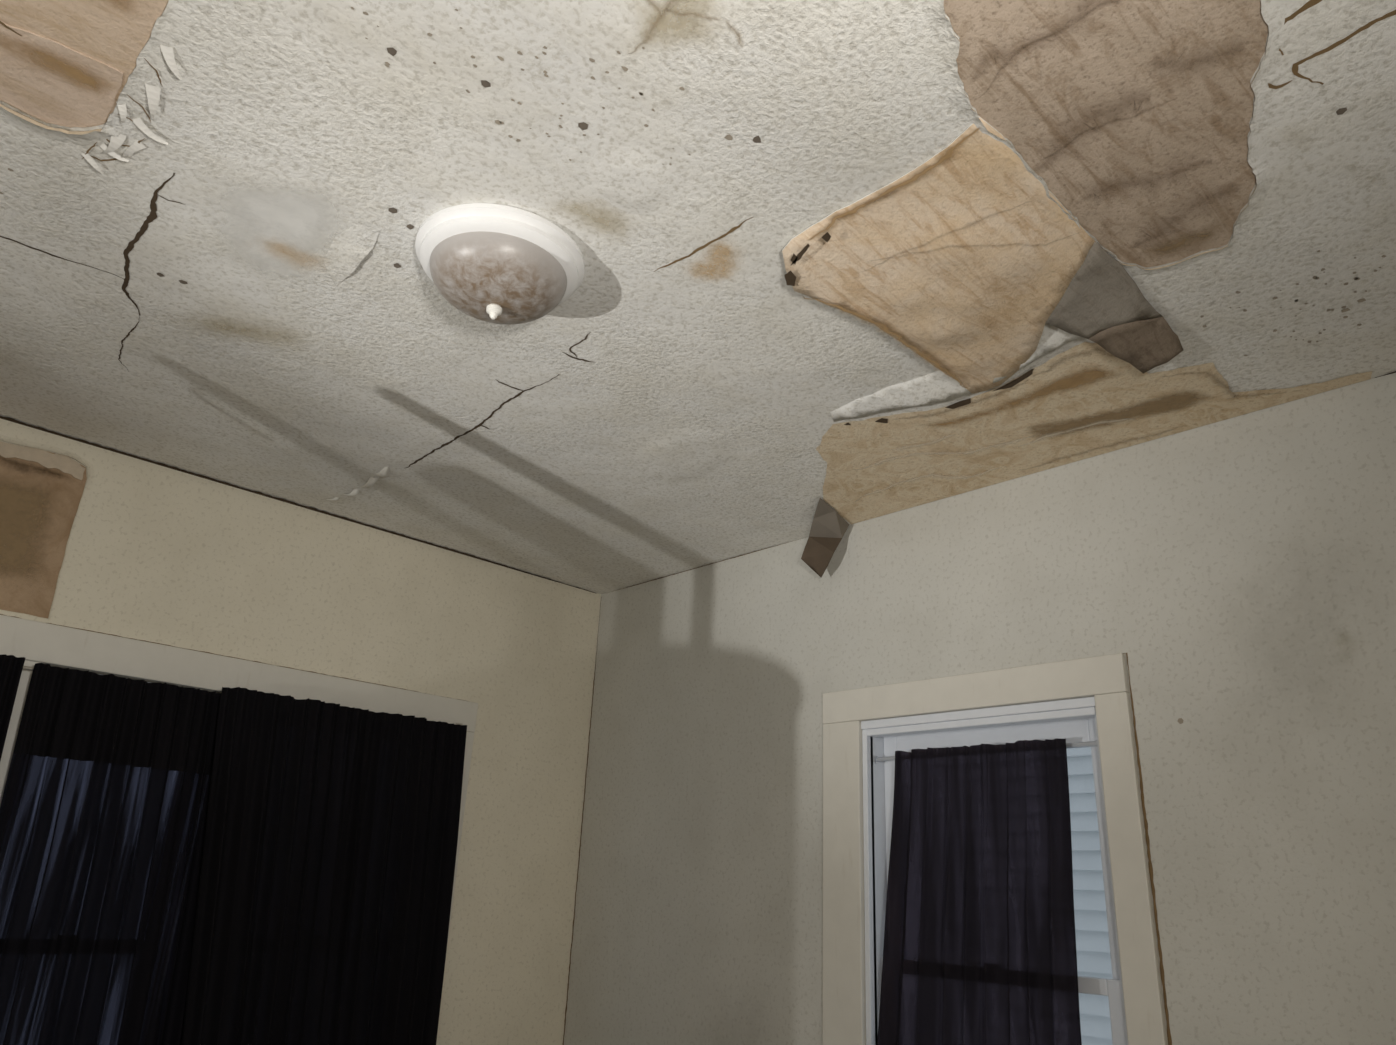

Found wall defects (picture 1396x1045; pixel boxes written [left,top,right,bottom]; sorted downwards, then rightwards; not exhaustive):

peeling [0,0,211,173]
crack [1268,0,1396,89]
crack [0,173,185,370]
peeling [782,0,1372,577]
crack [0,334,806,1045]